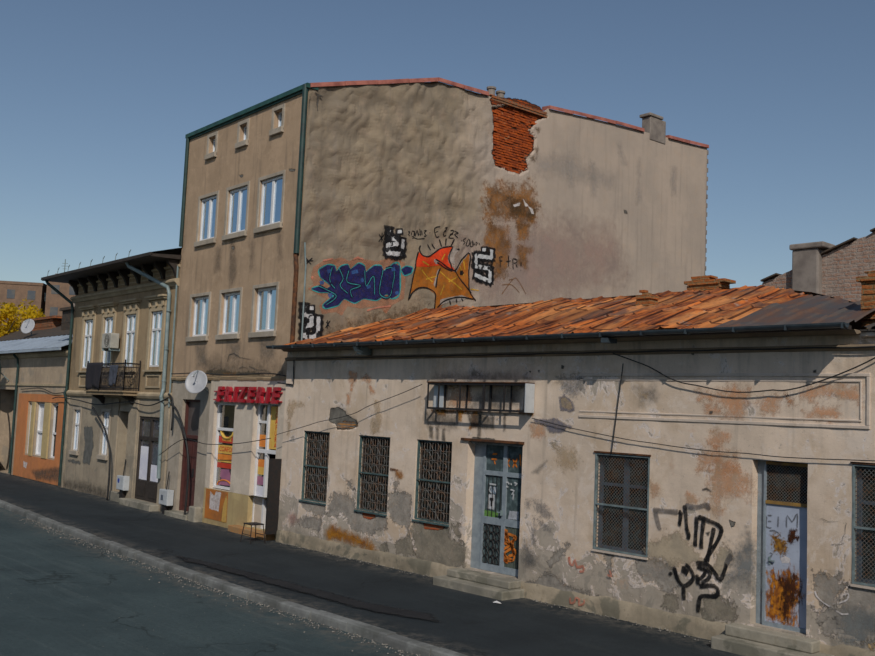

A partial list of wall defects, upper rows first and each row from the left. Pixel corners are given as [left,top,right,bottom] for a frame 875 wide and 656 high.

flaking render [490,97,544,174]
flaking render [297,468,467,568]
flaking render [525,542,599,597]
flaking render [635,556,680,613]
flaking render [700,593,739,624]
rust [770,529,799,558]
rust [765,566,804,627]
flaking render [811,568,875,650]